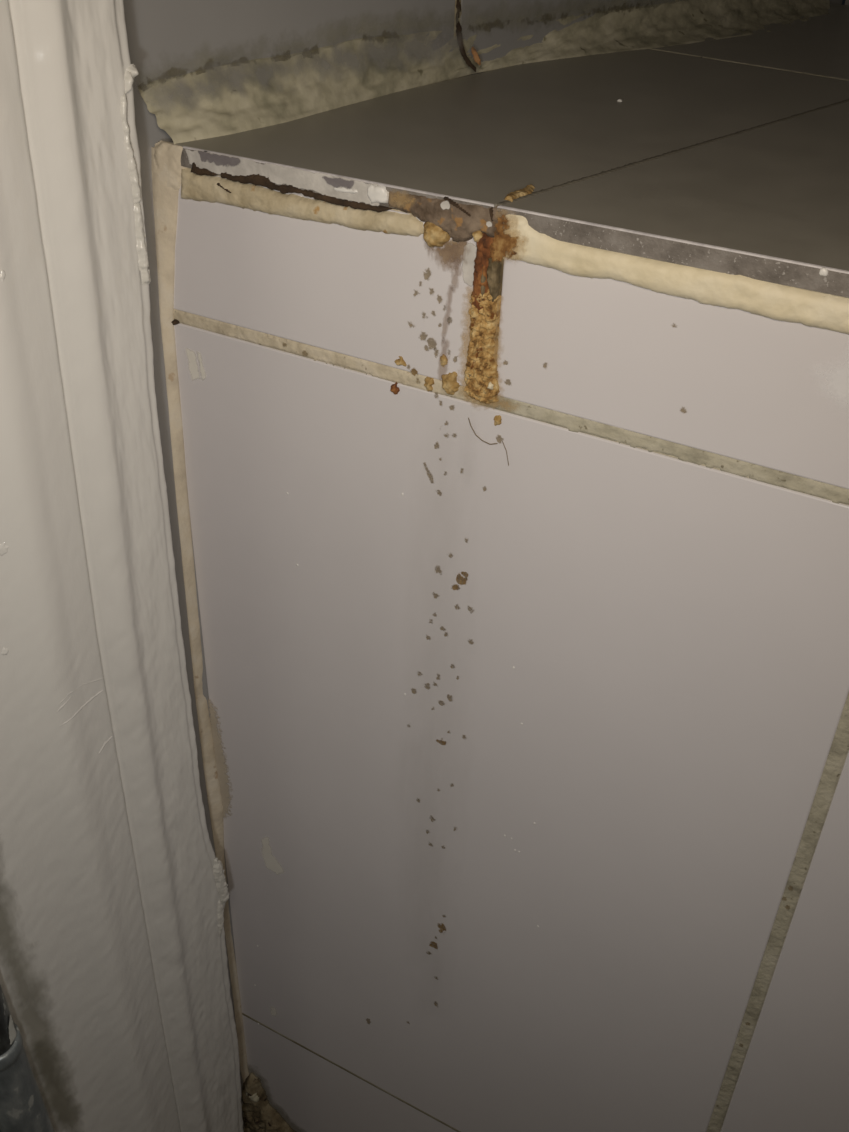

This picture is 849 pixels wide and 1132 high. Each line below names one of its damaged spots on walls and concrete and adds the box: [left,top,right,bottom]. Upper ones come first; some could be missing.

corrosion [423,215,518,426]